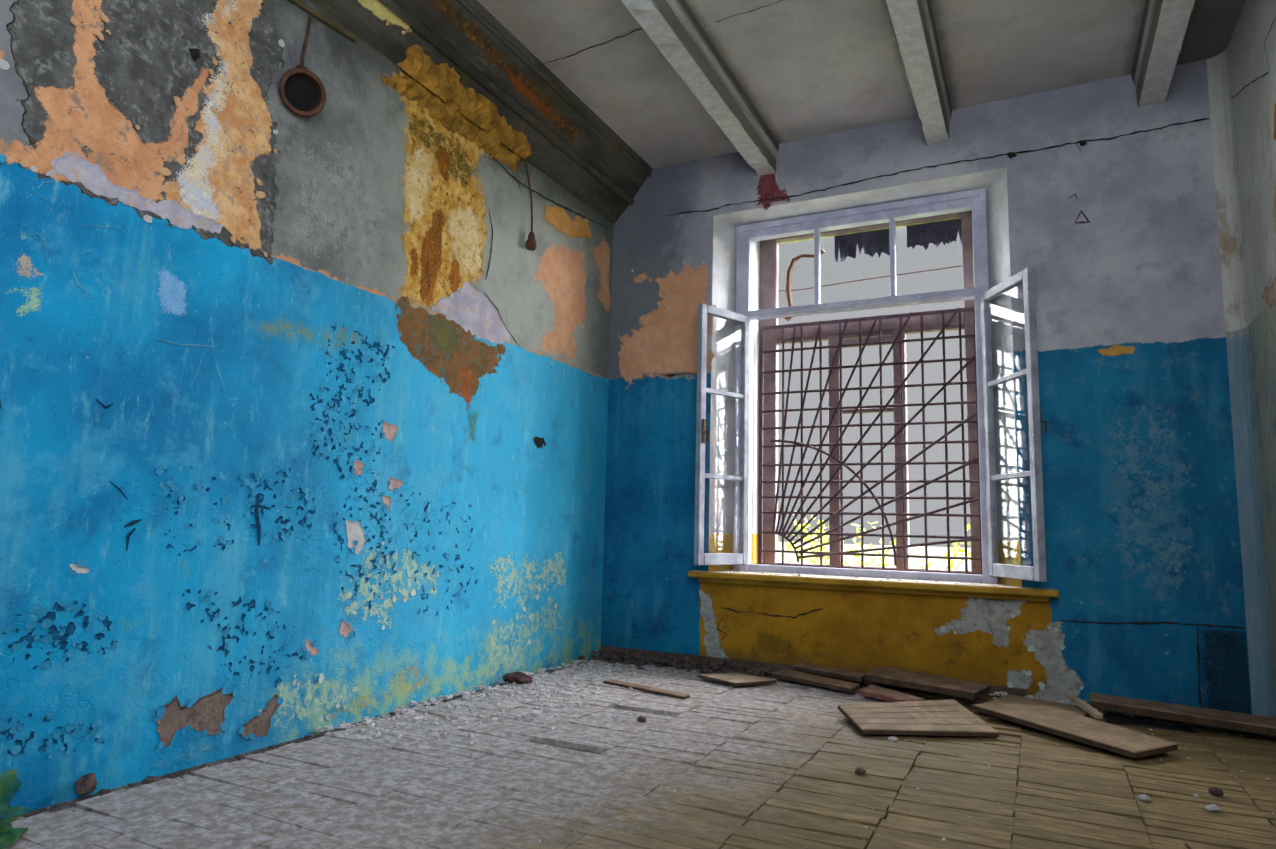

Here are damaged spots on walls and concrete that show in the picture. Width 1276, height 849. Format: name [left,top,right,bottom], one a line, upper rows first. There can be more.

crack [717,0,783,22]
peeling [0,0,285,265]
flaking render [381,45,532,172]
crack [667,16,1276,216]
peeling [432,281,512,344]
peeling [617,261,720,389]
peeling [153,466,234,556]
peeling [238,313,566,677]
flaking render [152,589,319,749]
peeling [935,597,1085,702]